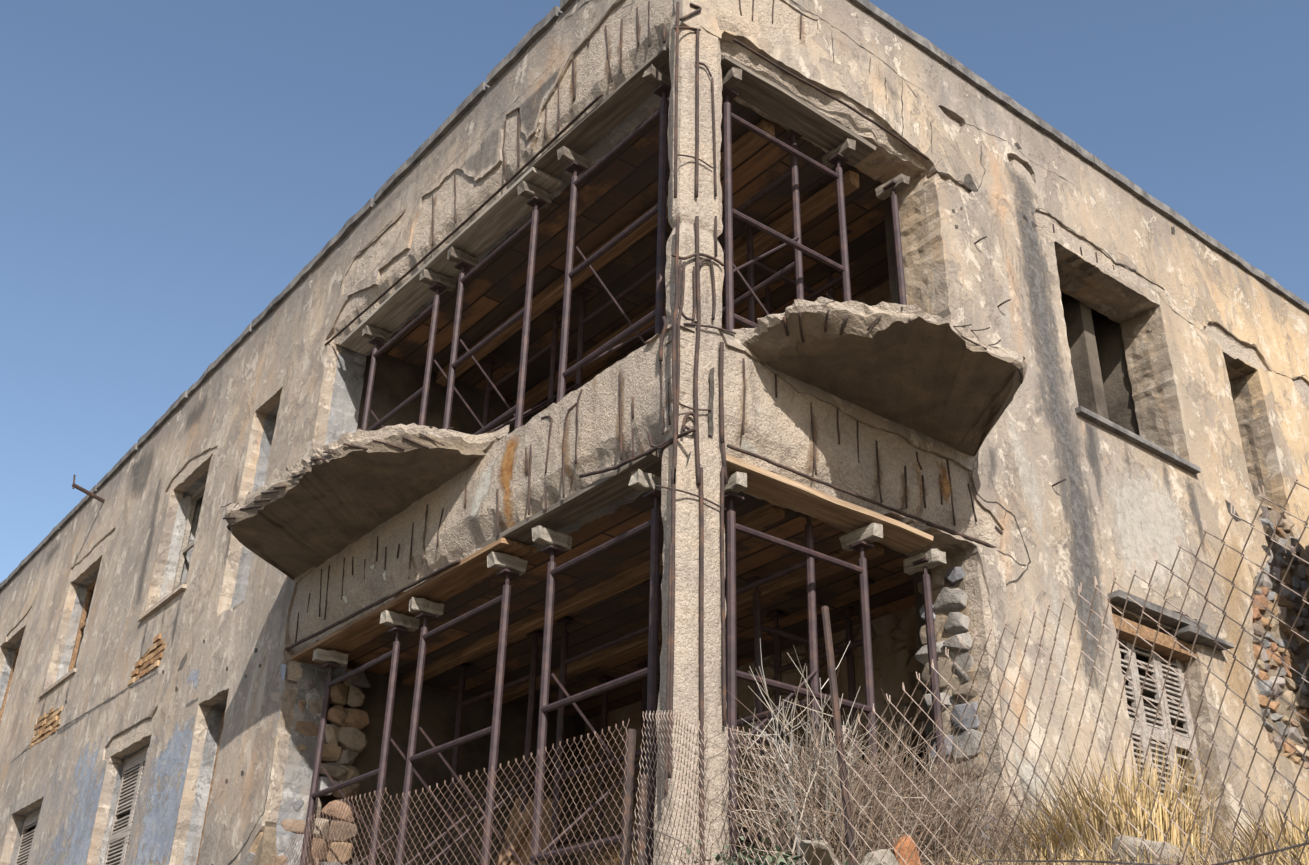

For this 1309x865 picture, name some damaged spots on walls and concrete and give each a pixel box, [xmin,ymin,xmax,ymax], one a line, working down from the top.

spalling [325,0,978,352]
leakage [1007,165,1109,687]
spalling [222,433,445,531]
rust [500,438,518,527]
spalling [277,216,1045,865]
leakage [1189,488,1204,545]
spalling [127,633,166,685]
spalling [1248,505,1309,772]
spalling [29,700,67,749]
peeling [43,710,194,865]
spalling [241,821,277,865]